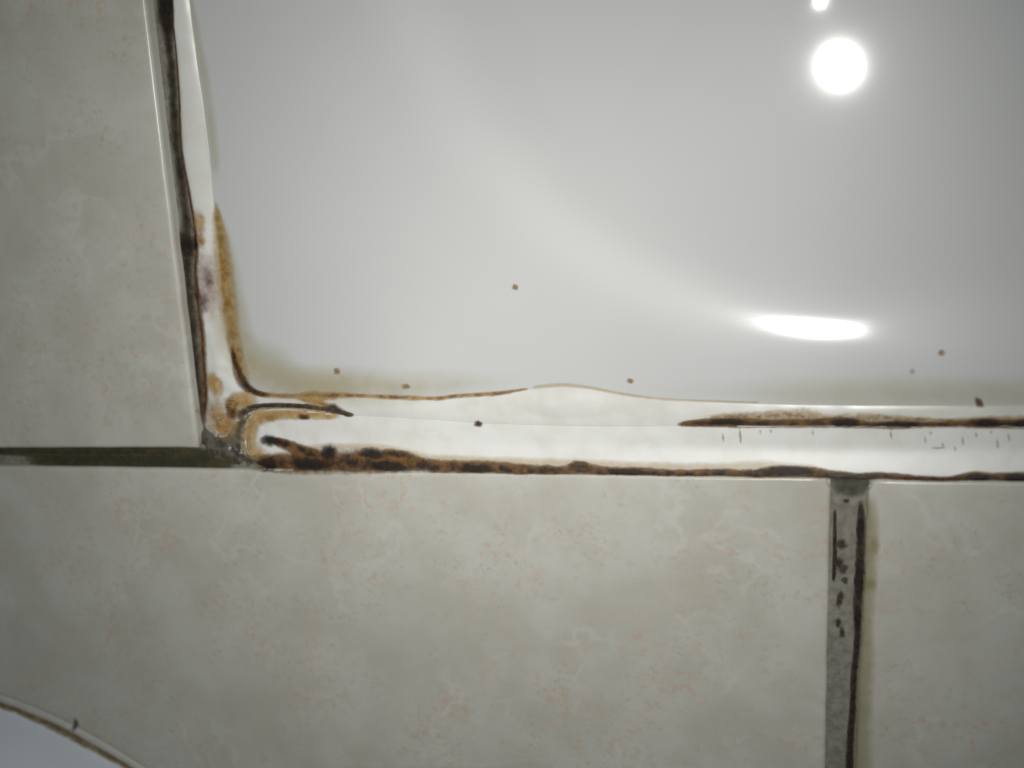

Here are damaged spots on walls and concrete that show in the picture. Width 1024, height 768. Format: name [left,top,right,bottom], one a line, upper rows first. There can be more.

leakage [158,0,217,422]
leakage [253,436,1024,481]
leakage [679,417,1024,429]
leakage [832,499,871,768]